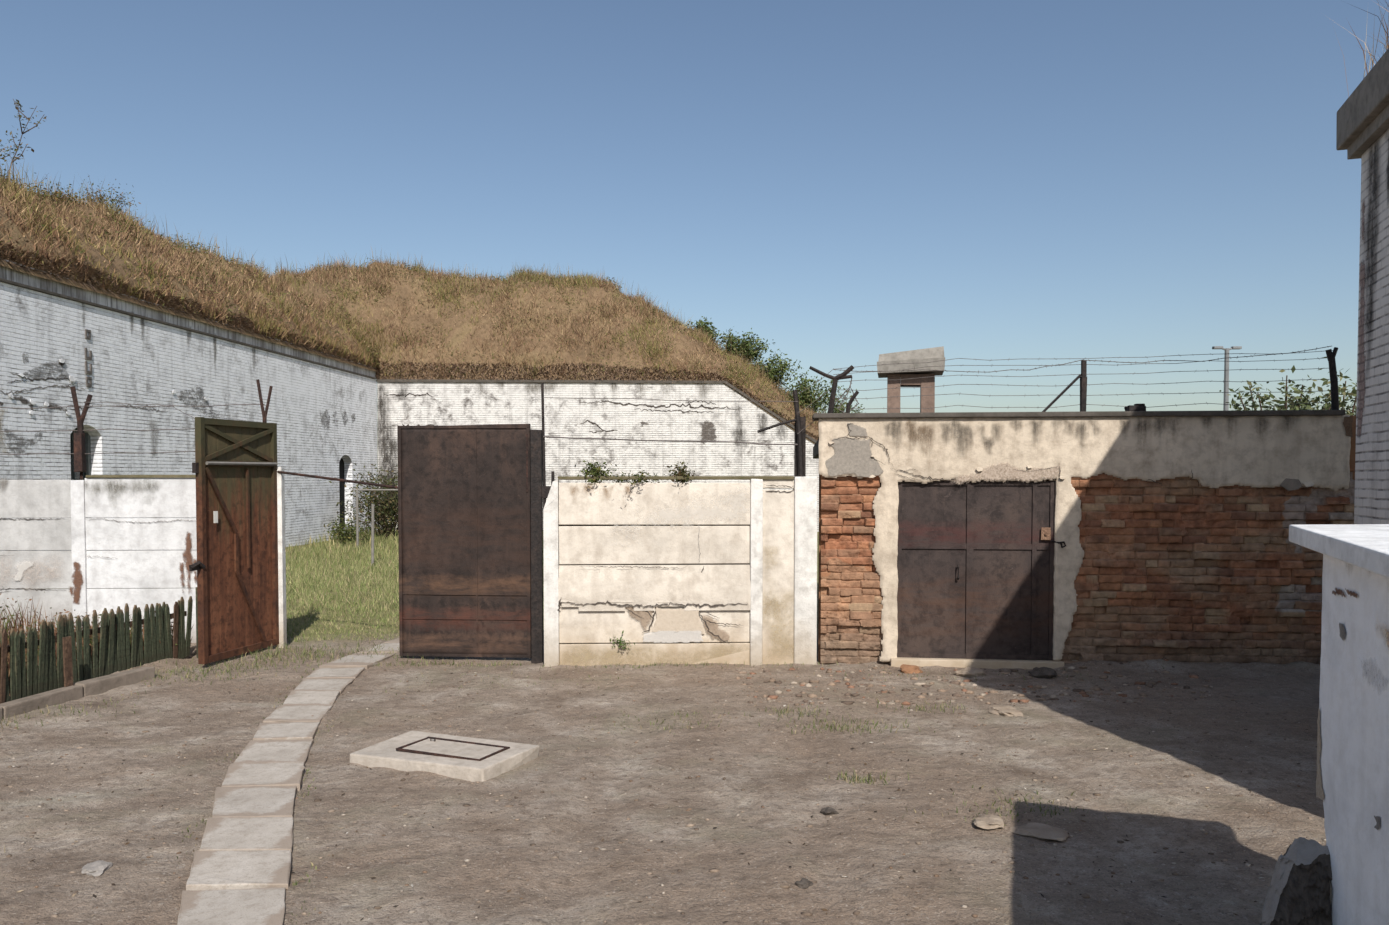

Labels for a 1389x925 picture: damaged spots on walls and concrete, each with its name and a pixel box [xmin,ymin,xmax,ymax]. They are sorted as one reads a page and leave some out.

water stain [1366,139,1389,353]
peeling [19,353,76,382]
peeling [0,393,71,415]
crack [580,400,739,433]
corrosion [69,562,83,604]
corrosion [180,532,197,589]
peeling [820,423,890,664]
peeling [956,463,1355,665]
spalling [627,607,730,643]
peeling [1316,709,1324,801]